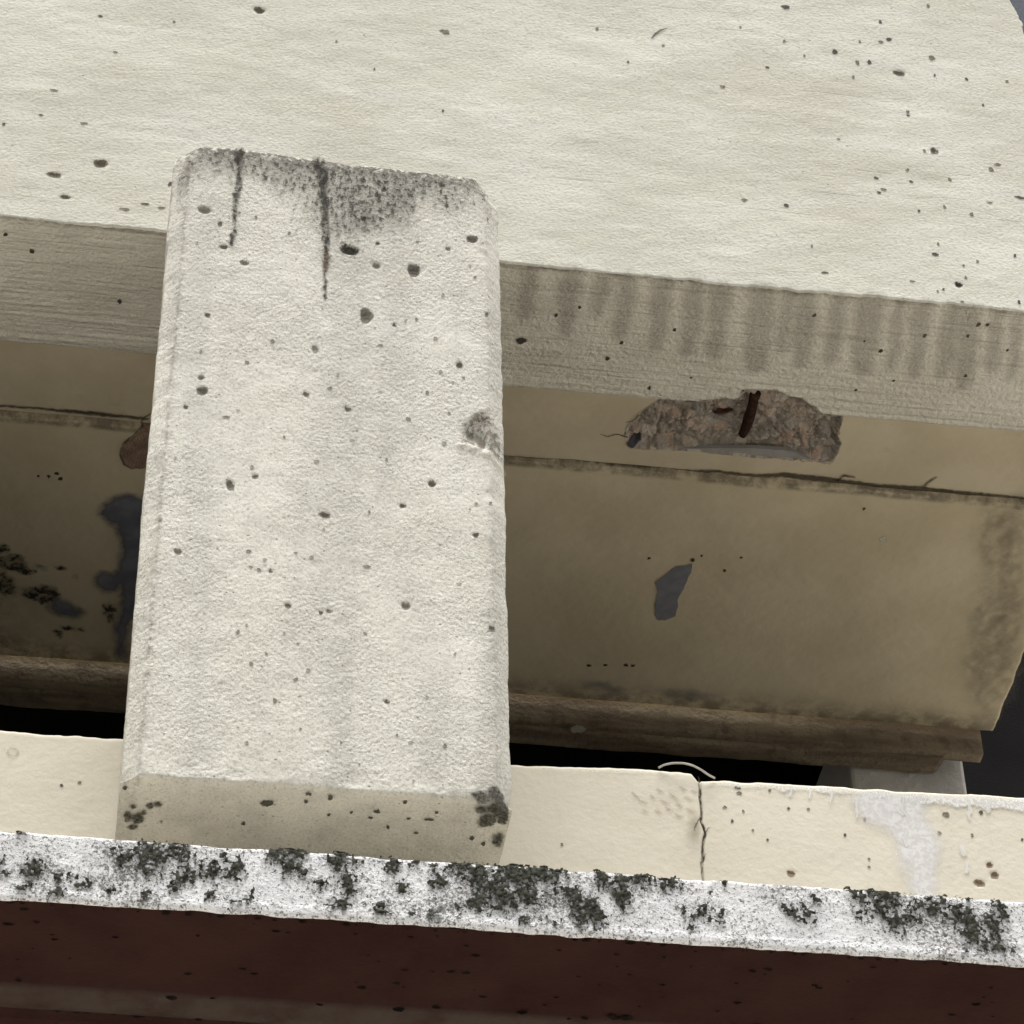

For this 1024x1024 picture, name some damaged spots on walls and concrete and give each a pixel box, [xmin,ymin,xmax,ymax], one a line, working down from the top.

leakage [229,148,245,246]
leakage [313,158,330,299]
spalling [603,389,843,465]
leakage [0,544,60,604]
peeling [655,555,703,620]
crack [695,777,708,874]
leakage [854,792,940,896]